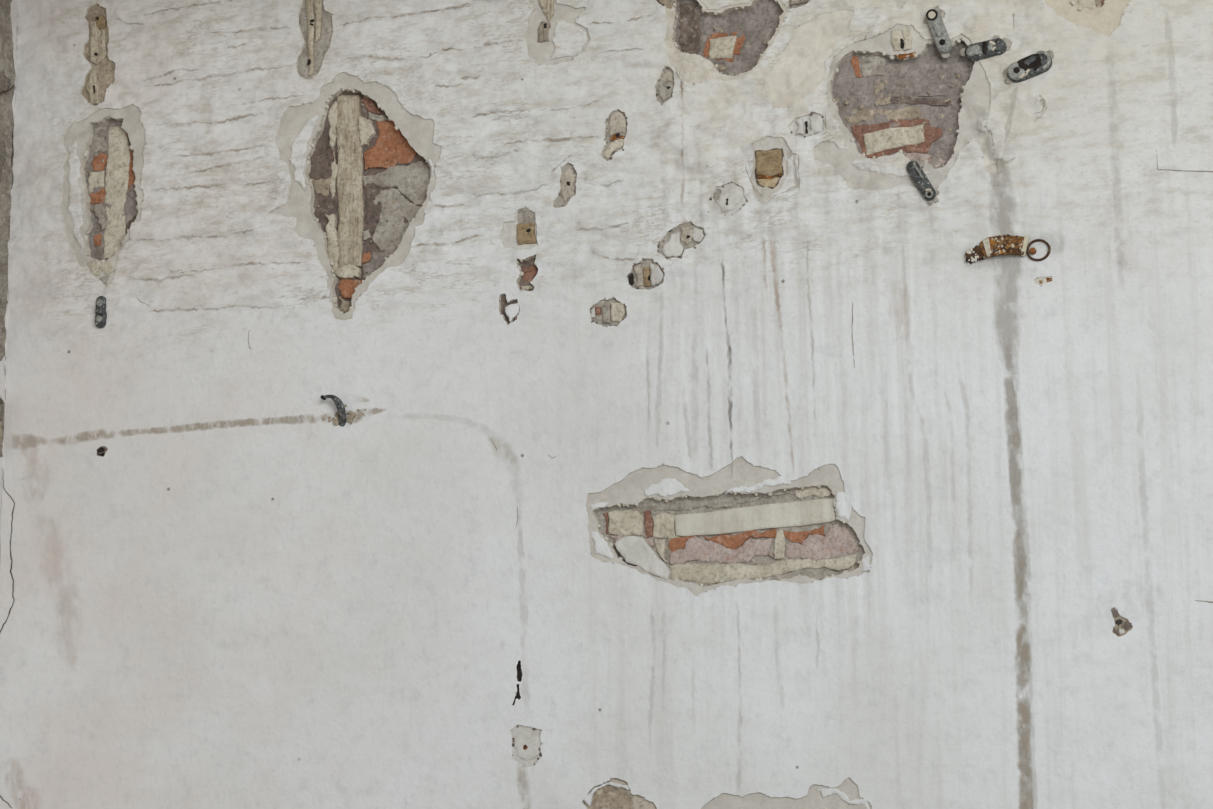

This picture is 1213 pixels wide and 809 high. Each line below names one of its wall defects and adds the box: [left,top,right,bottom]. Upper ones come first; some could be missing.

spalling [656,0,795,105]
spalling [1045,0,1131,37]
spalling [791,24,1003,190]
spalling [60,104,146,287]
spalling [269,72,442,320]
corrosion [966,234,1025,264]
damp [997,257,1015,364]
damp [152,416,313,433]
spalling [586,456,873,596]
damp [1005,379,1030,779]
flaking render [582,778,657,809]
spalling [701,778,872,809]